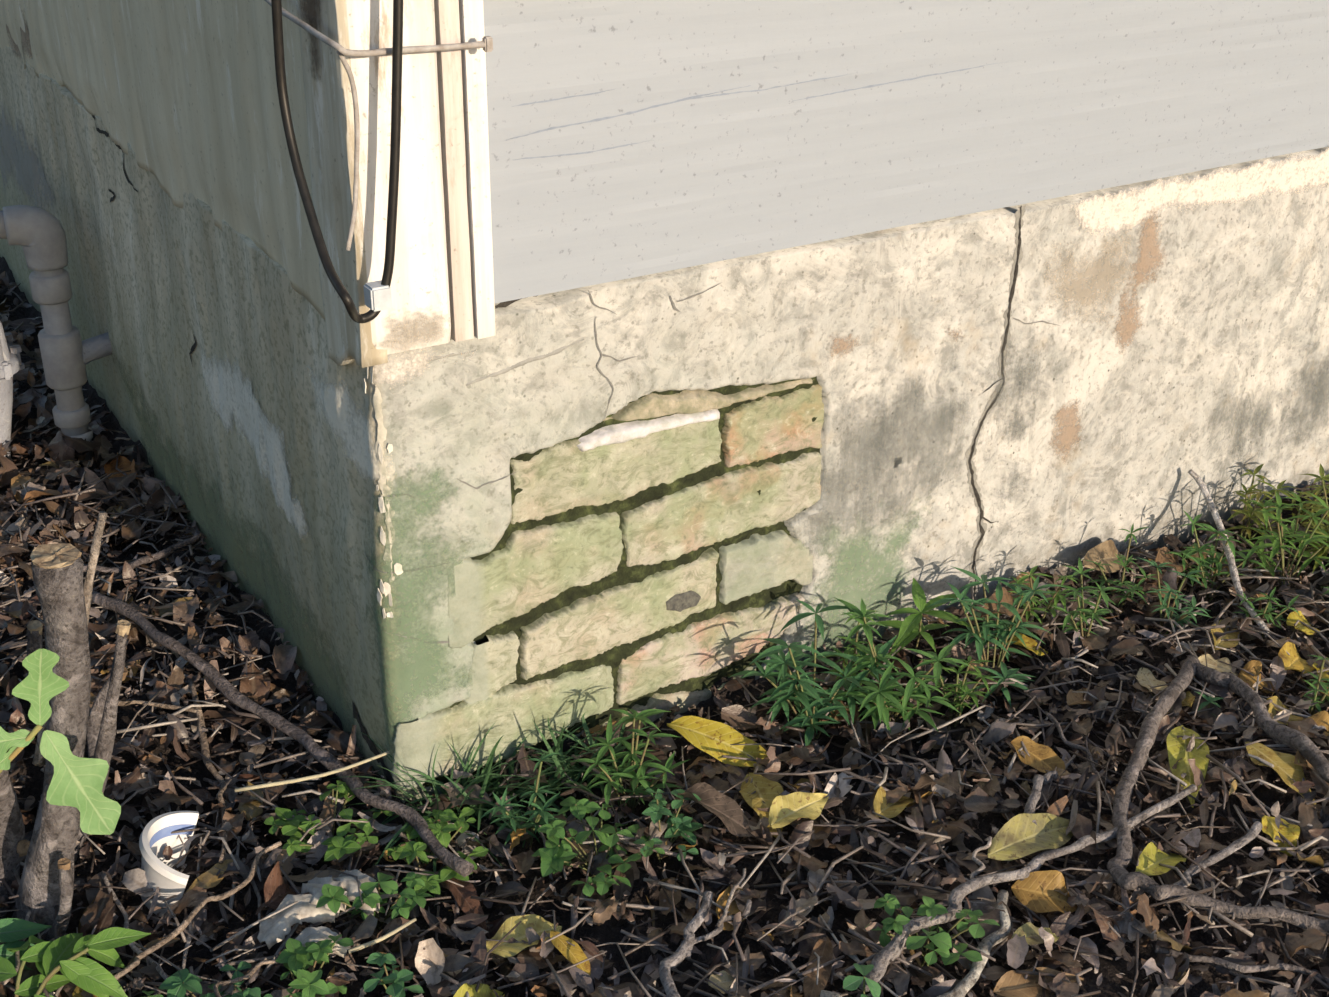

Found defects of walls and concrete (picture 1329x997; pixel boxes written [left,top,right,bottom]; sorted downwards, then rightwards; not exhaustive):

crack [92,115,138,202]
crack [588,290,637,420]
crack [670,284,719,312]
crack [965,205,1060,600]
spalling [391,376,824,791]